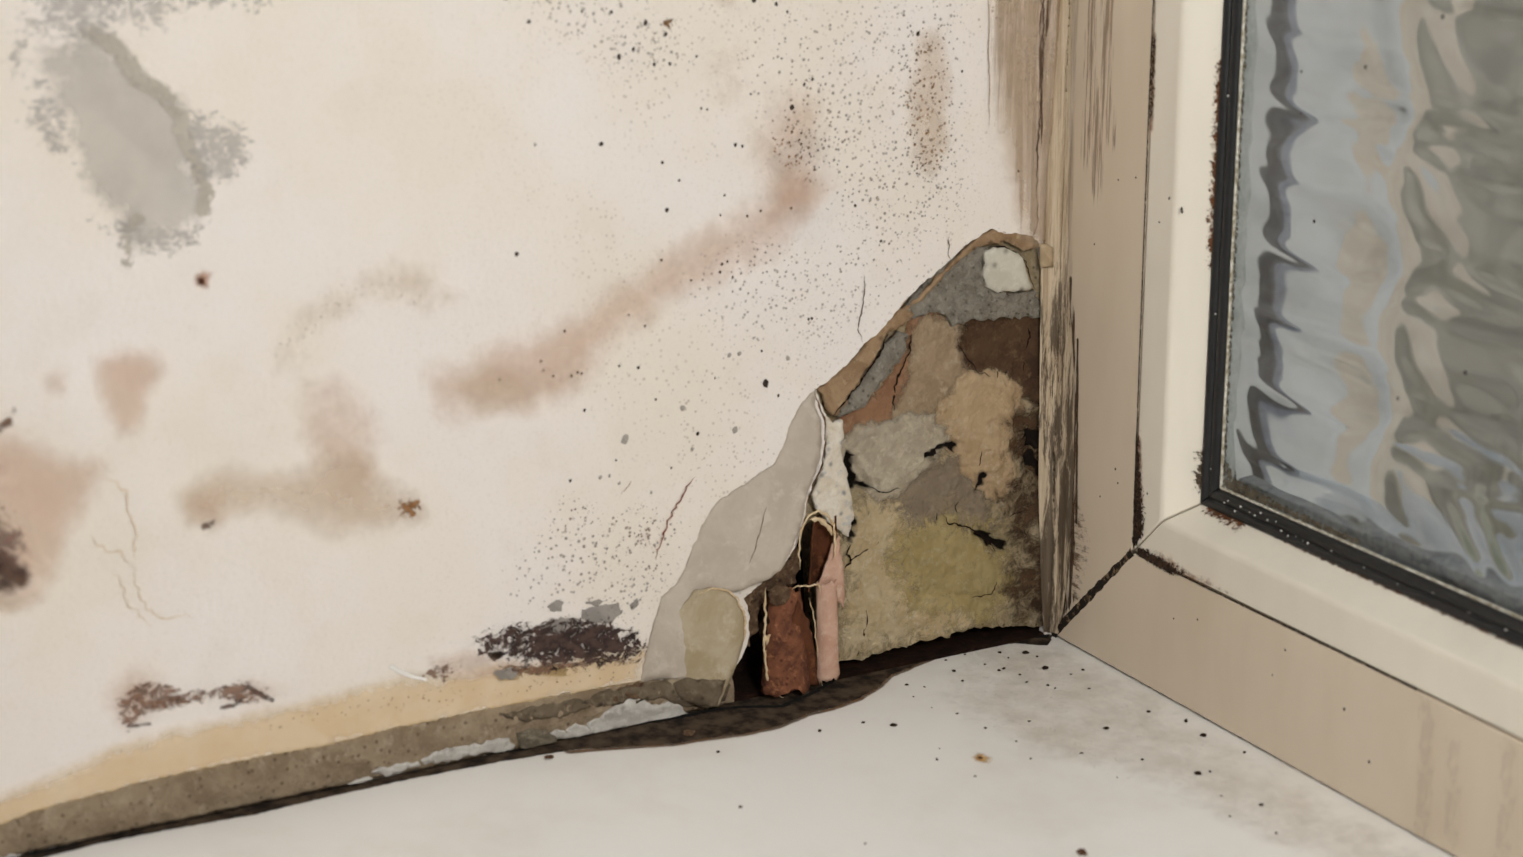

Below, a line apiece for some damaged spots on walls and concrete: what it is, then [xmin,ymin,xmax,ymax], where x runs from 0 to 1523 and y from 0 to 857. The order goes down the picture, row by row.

peeling [46,24,215,269]
water stain [772,104,820,183]
water stain [1039,0,1049,145]
water stain [0,530,28,590]
crack [92,475,193,627]
water stain [399,499,421,520]
flaking render [641,229,1054,707]
water stain [1061,276,1086,620]
water stain [0,599,734,857]